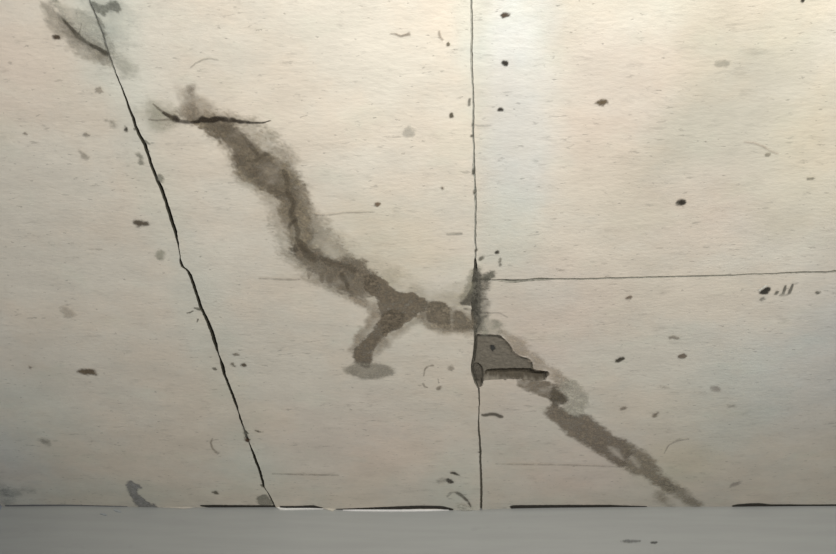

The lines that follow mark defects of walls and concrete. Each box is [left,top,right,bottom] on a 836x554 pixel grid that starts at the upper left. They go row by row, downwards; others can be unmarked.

crack [63,0,275,506]
damp [184,104,474,378]
spalling [472,332,549,388]
damp [519,374,702,506]
crack [469,0,836,508]